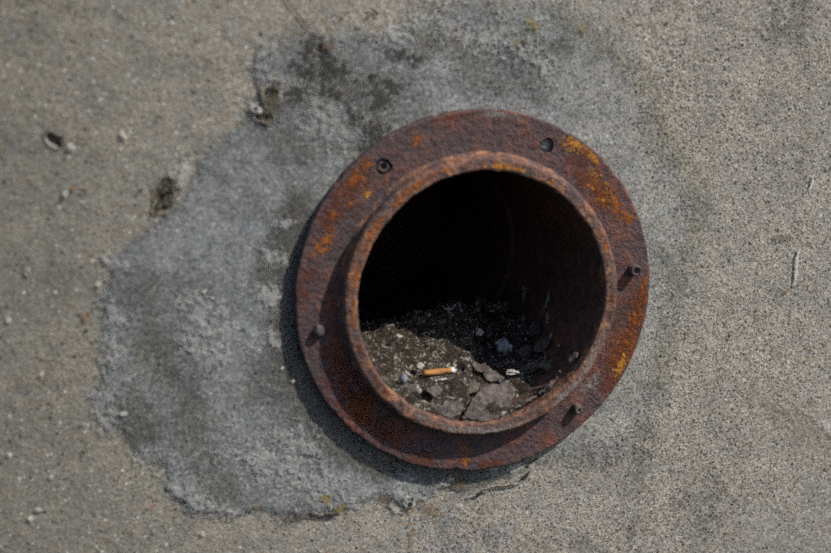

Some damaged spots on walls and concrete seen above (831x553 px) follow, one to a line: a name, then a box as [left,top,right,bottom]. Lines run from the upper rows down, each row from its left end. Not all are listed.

water stain [248,18,572,178]
rust [309,157,373,258]
rust [563,134,636,225]
rust [399,382,528,434]
rust [468,362,492,394]
rust [502,337,561,405]
rust [553,272,648,405]